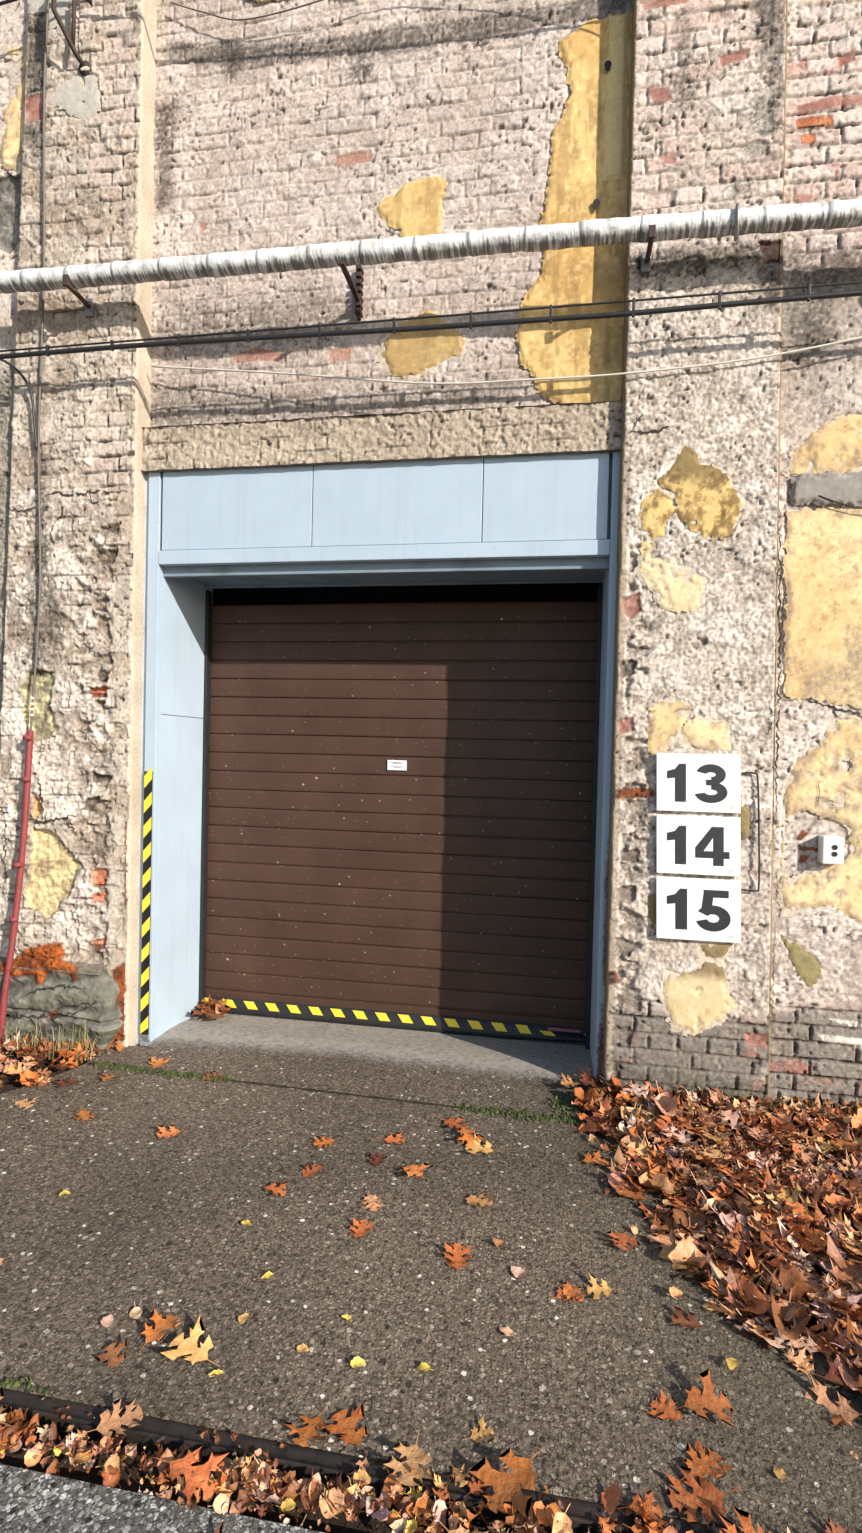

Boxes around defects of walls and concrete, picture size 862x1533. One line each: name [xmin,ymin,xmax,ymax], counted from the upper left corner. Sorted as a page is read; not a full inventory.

flaking render [0,40,43,254]
flaking render [370,173,449,238]
flaking render [539,0,686,225]
flaking render [373,309,468,382]
flaking render [515,243,626,404]
flaking render [623,443,746,619]
spalling [91,598,113,710]
spalling [82,772,113,813]
flaking render [776,506,862,987]
spalling [25,797,108,919]
spalling [614,885,660,957]
flaking render [656,940,740,1037]